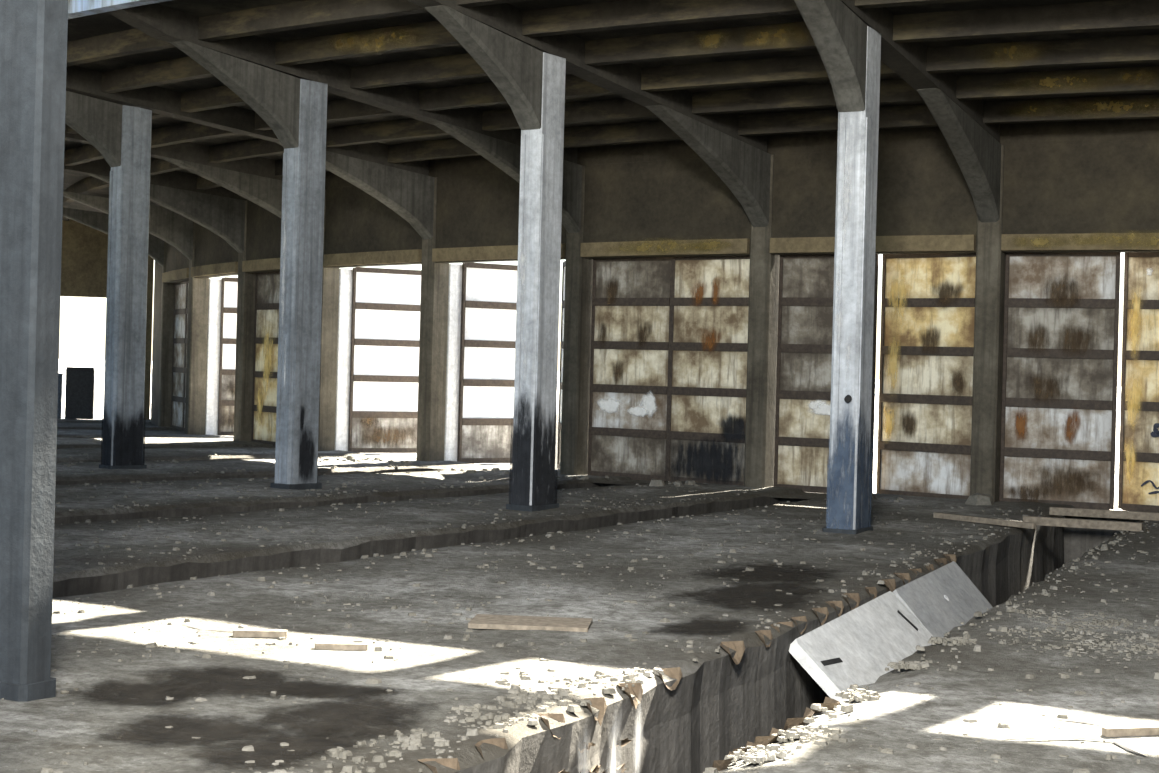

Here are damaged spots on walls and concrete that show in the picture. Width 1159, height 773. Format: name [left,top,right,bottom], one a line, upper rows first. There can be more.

rust [1131,294,1141,351]
rust [888,340,898,388]
leakage [101,409,146,466]
leakage [509,397,559,506]
leakage [598,394,656,416]
leakage [672,415,745,482]
rust [885,412,894,437]
rust [1126,447,1135,483]
rust [1128,380,1142,422]
spalling [417,516,1139,773]
leakage [69,667,426,769]